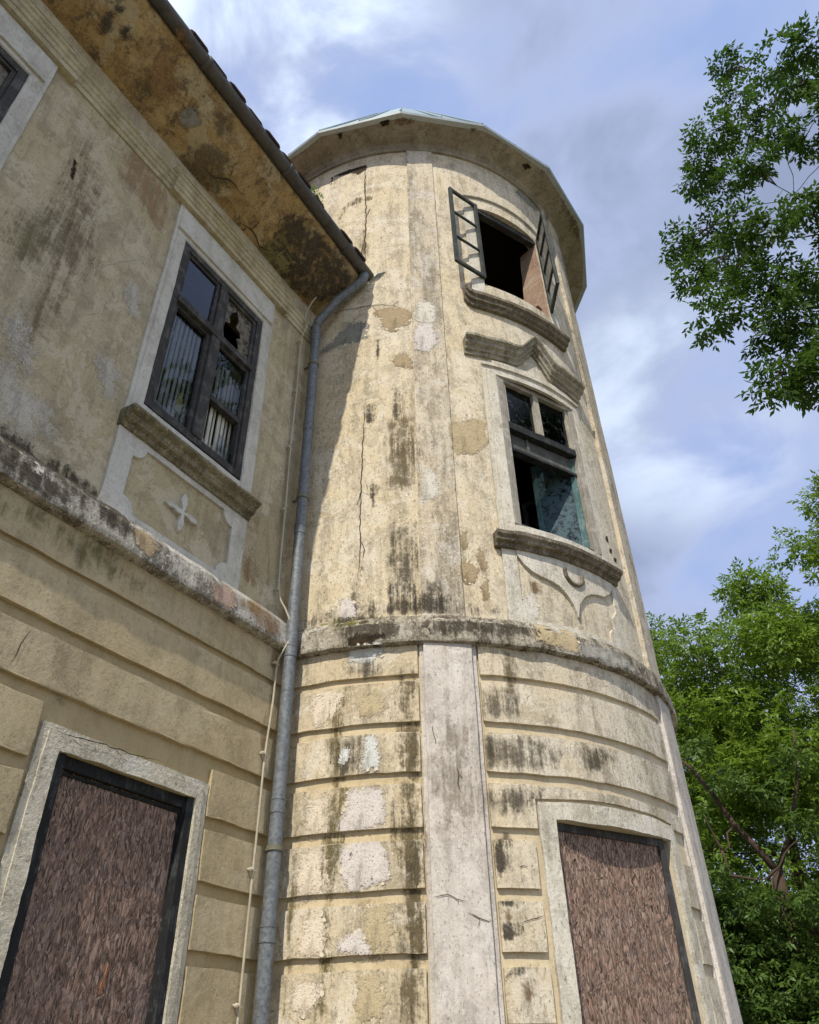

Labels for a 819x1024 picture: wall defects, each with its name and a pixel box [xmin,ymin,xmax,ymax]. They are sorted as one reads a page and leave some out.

leakage [179,112,238,193]
crack [242,220,275,252]
leakage [270,213,350,304]
crack [361,163,371,262]
peeling [320,300,439,369]
crack [357,413,365,571]
leakage [366,416,415,504]
peeling [449,418,489,456]
peeling [338,734,381,772]
peeling [289,787,400,1024]